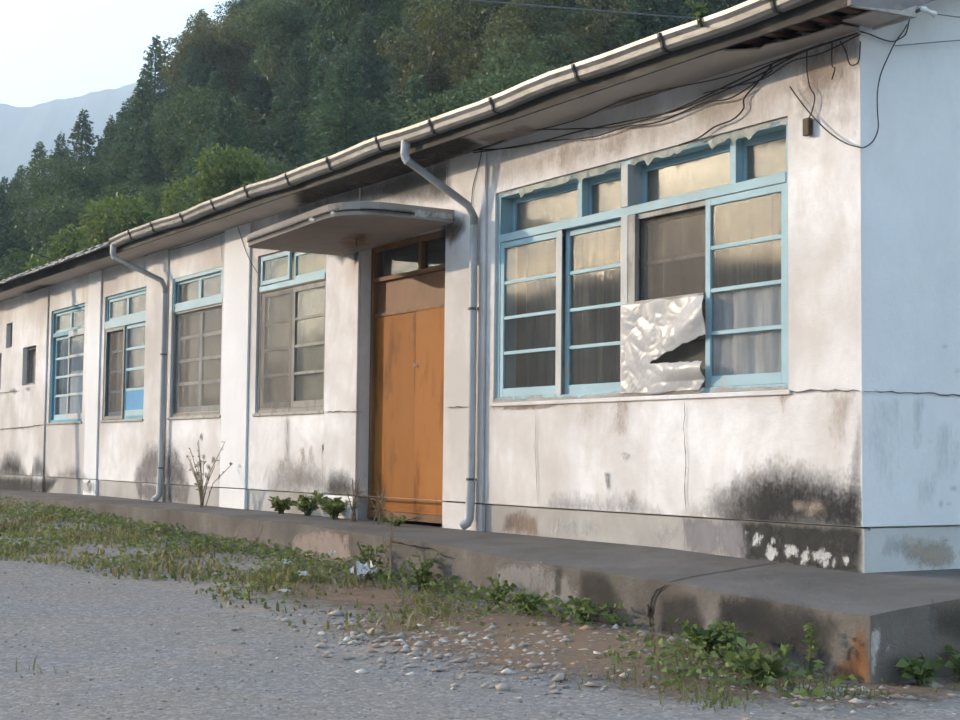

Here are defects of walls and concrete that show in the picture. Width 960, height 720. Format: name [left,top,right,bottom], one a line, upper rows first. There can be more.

crack [790,389,960,397]
damp [0,460,55,492]
damp [136,450,188,502]
damp [278,474,347,494]
crack [681,401,689,545]
mould [685,473,861,573]
peeling [745,531,849,568]